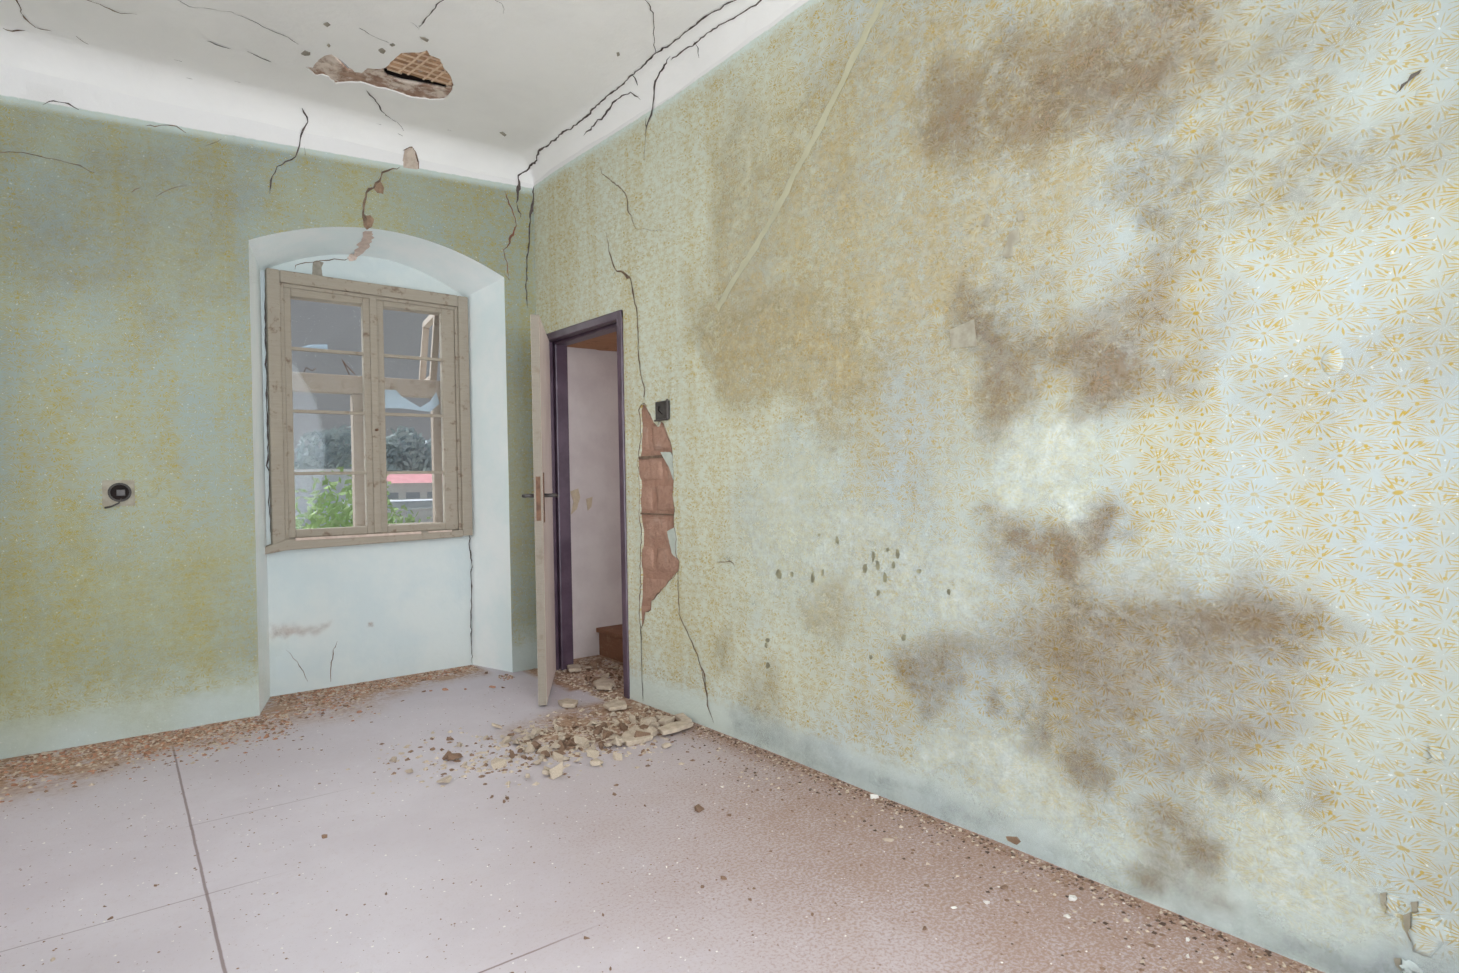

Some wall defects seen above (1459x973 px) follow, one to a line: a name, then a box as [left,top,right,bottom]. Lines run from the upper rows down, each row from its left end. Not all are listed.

crack [3,0,87,44]
spalling [301,22,453,99]
crack [361,0,443,42]
crack [270,108,308,189]
crack [362,168,398,227]
crack [503,0,762,397]
leakage [704,1,1206,581]
spalling [637,403,679,628]
leakage [747,477,979,622]
crack [678,592,714,723]
leakage [921,734,1153,883]
peeling [1379,892,1454,973]